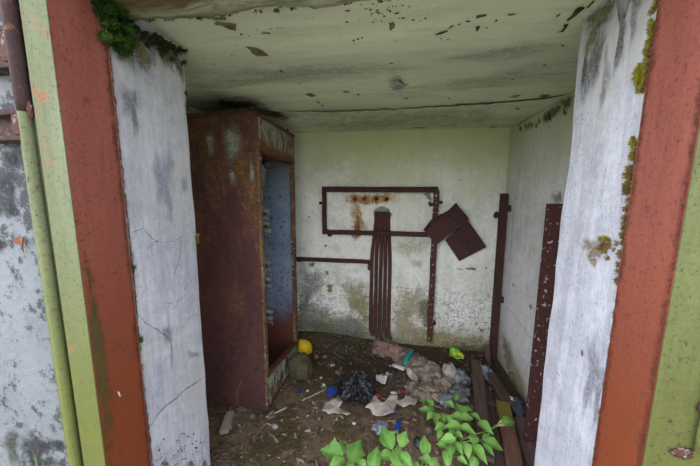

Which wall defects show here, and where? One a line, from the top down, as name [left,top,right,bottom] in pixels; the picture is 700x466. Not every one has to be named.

spalling [211,17,250,45]
spalling [360,1,426,30]
water stain [614,0,640,67]
spalling [245,46,271,63]
water stain [581,36,604,91]
mould [211,95,288,118]
crack [278,93,571,112]
water stain [0,176,16,215]
rust [346,194,390,238]
crack [110,57,202,465]
water stain [300,263,369,336]
mould [5,433,63,466]